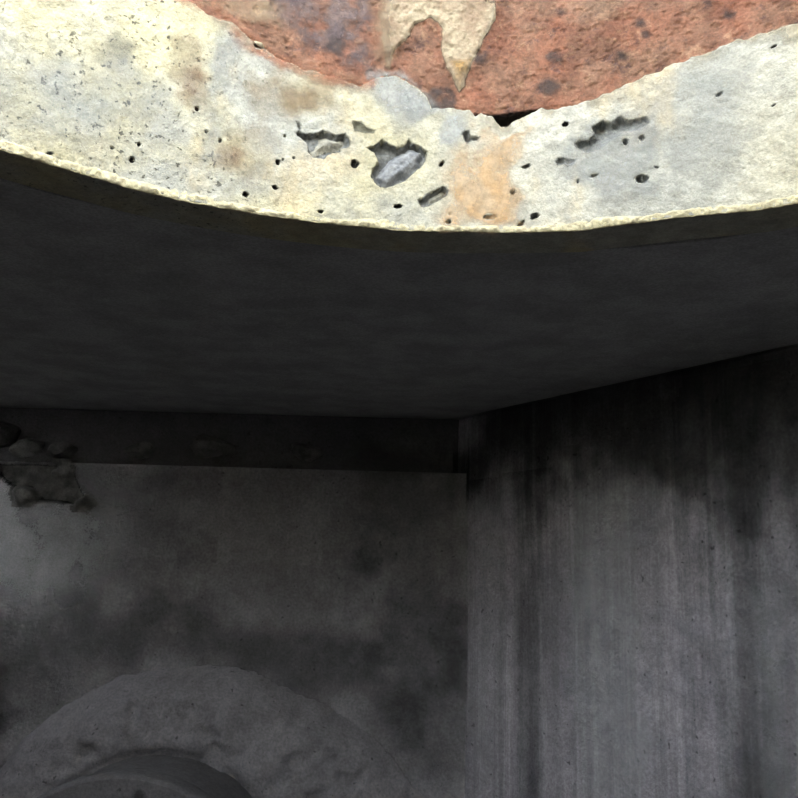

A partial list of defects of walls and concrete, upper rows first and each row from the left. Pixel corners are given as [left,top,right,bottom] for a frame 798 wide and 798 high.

hole [297,123,350,159]
hole [352,121,375,133]
hole [575,117,649,153]
hole [369,140,427,188]